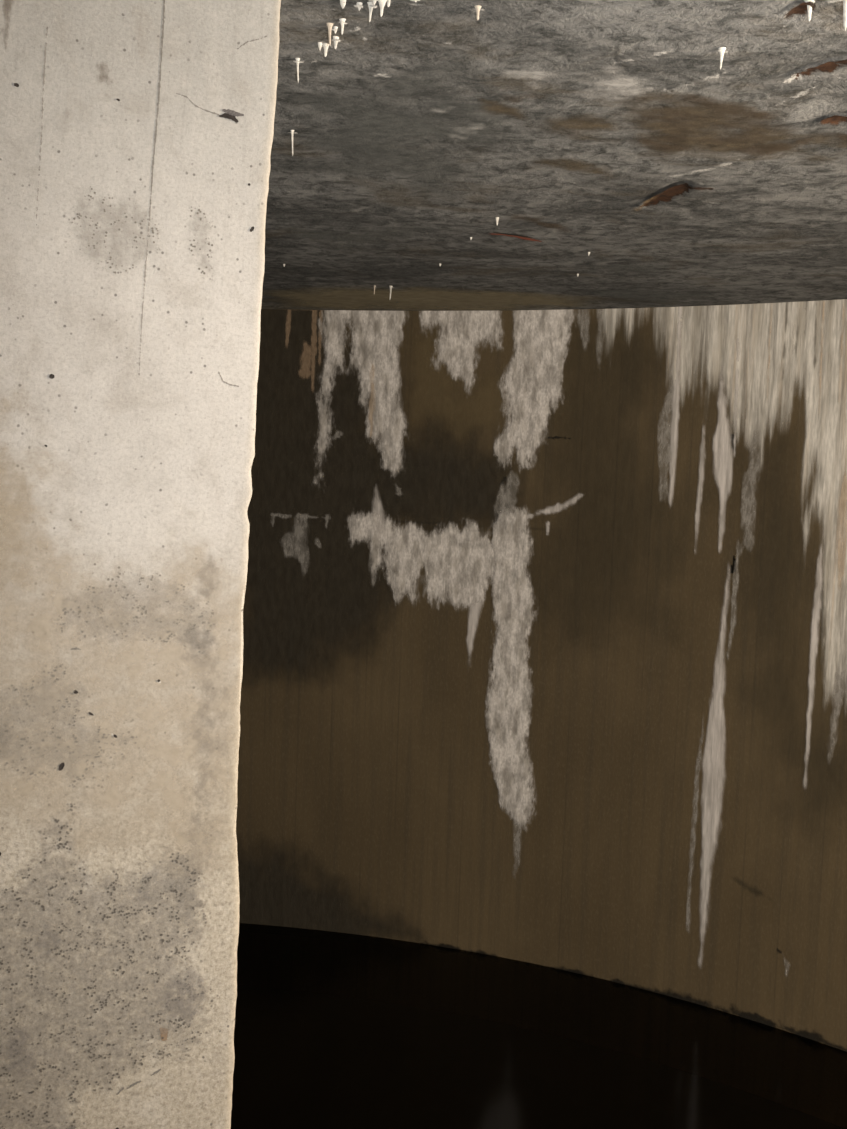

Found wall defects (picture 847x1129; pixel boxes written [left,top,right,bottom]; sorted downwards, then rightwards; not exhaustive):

damp [60,573,212,654]
damp [243,289,847,852]
damp [687,577,738,940]